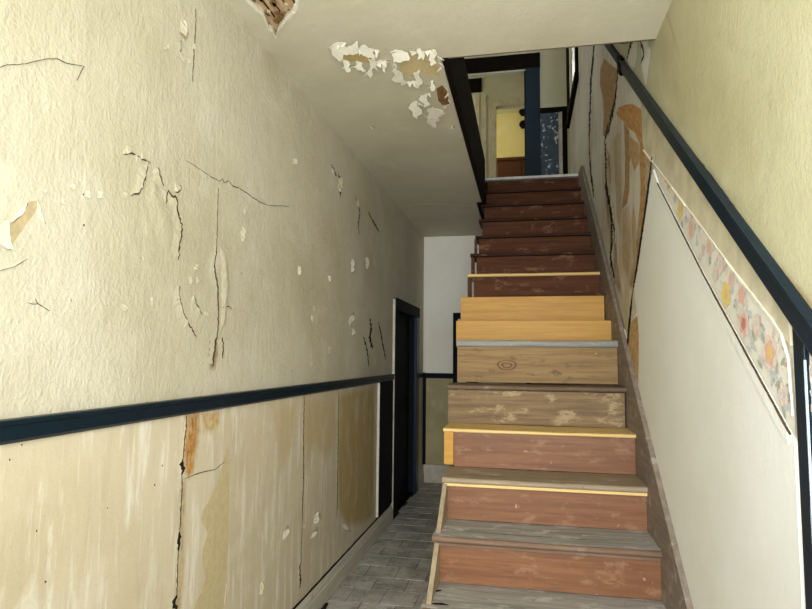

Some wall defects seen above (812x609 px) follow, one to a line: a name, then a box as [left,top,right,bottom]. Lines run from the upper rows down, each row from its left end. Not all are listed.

spalling [245,0,299,39]
crack [1,58,84,80]
peeling [327,40,453,128]
peeling [600,58,617,136]
peeling [0,189,47,250]
crack [27,299,49,314]
crack [123,145,183,260]
crack [173,160,289,366]
peeling [628,288,639,383]
crack [169,415,224,609]
peeling [193,446,230,609]